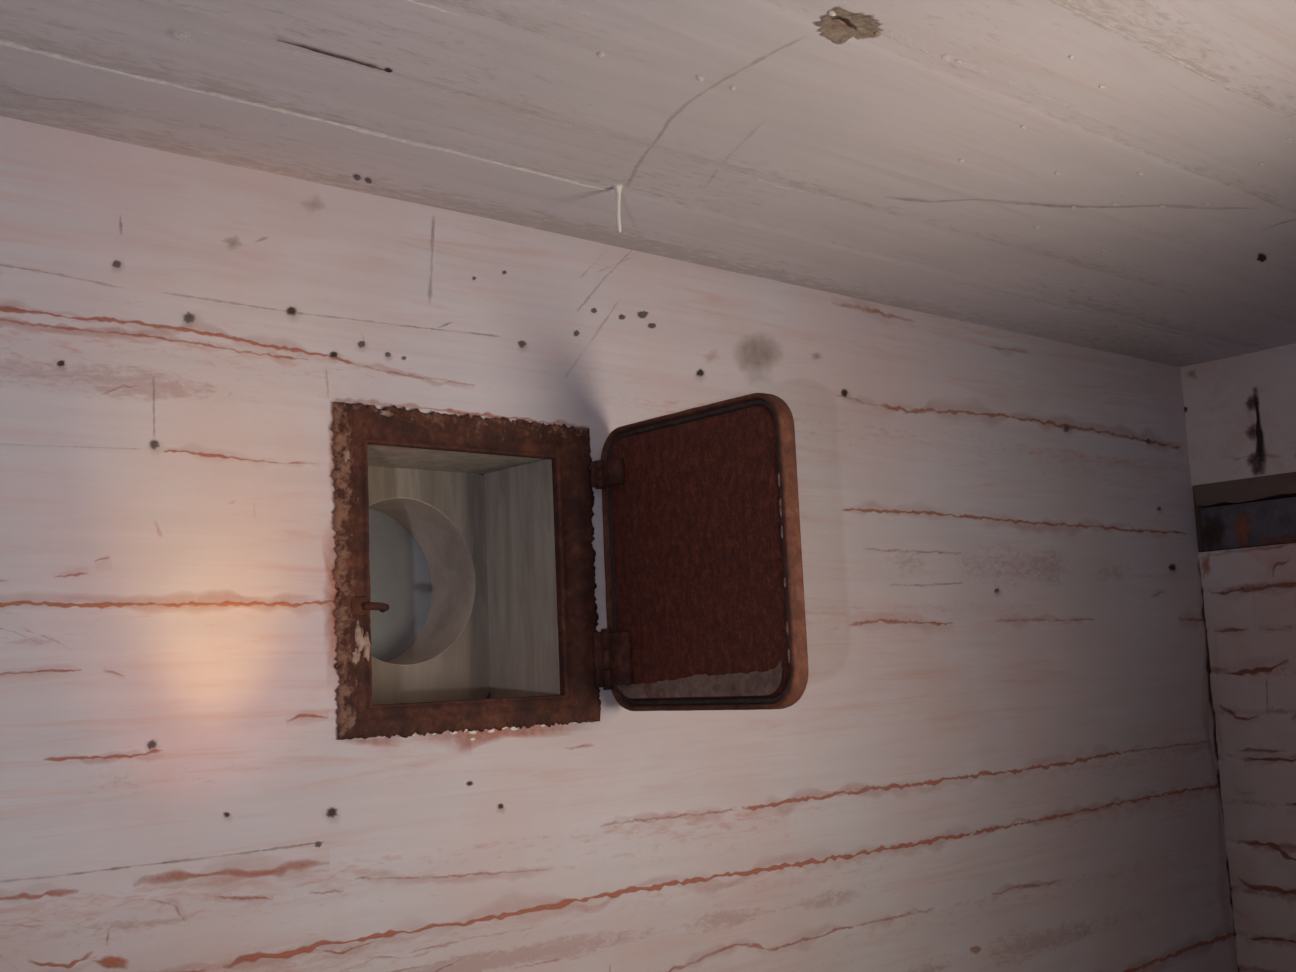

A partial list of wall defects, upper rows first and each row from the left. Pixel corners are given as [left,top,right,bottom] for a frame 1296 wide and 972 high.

spalling [815,8,915,44]
crack [230,563,1296,972]
rust [161,863,304,879]